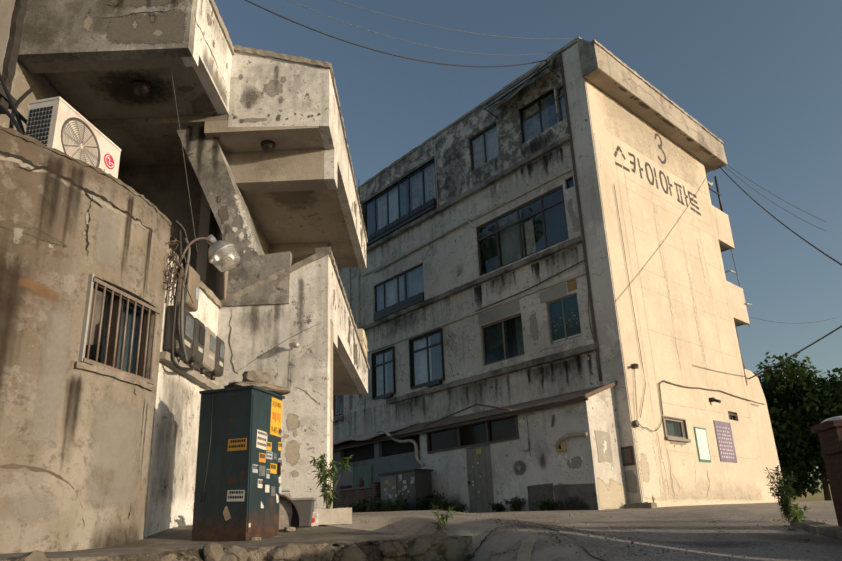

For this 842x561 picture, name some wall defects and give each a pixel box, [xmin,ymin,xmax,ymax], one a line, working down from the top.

leakage [100,72,172,104]
leakage [46,161,62,202]
crack [0,151,154,256]
peeling [217,195,258,253]
leakage [33,311,81,441]
crack [228,313,320,375]
peeling [331,289,367,382]
leakage [527,354,591,386]
peeling [282,413,300,477]